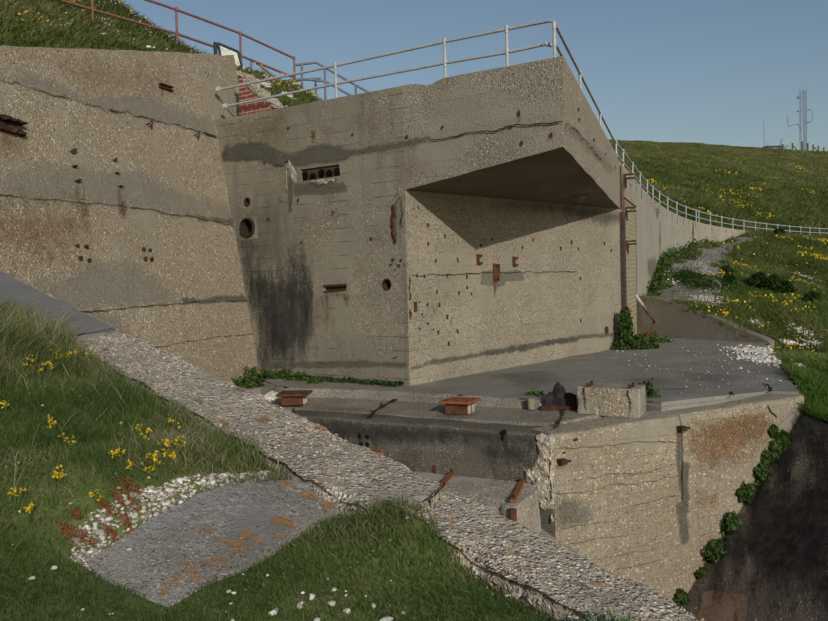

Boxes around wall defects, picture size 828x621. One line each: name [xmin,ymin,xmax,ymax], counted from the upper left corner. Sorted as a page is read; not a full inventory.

crack [3,80,217,138]
damp [222,137,429,166]
crack [430,121,603,161]
crack [0,187,233,226]
damp [182,278,310,356]
spalling [524,409,567,523]
rust [692,414,769,468]